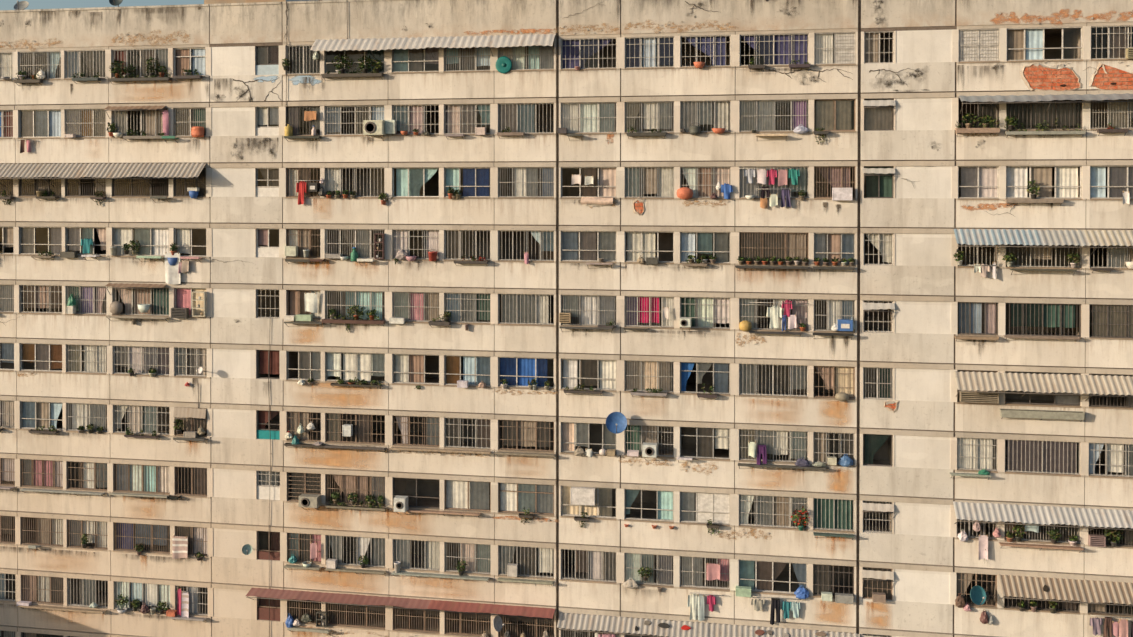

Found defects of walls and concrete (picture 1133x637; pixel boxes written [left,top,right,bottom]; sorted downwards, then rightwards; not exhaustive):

peeling [991,9,1133,24]
crack [769,68,923,85]
spalling [1020,61,1133,93]
crack [233,79,281,102]